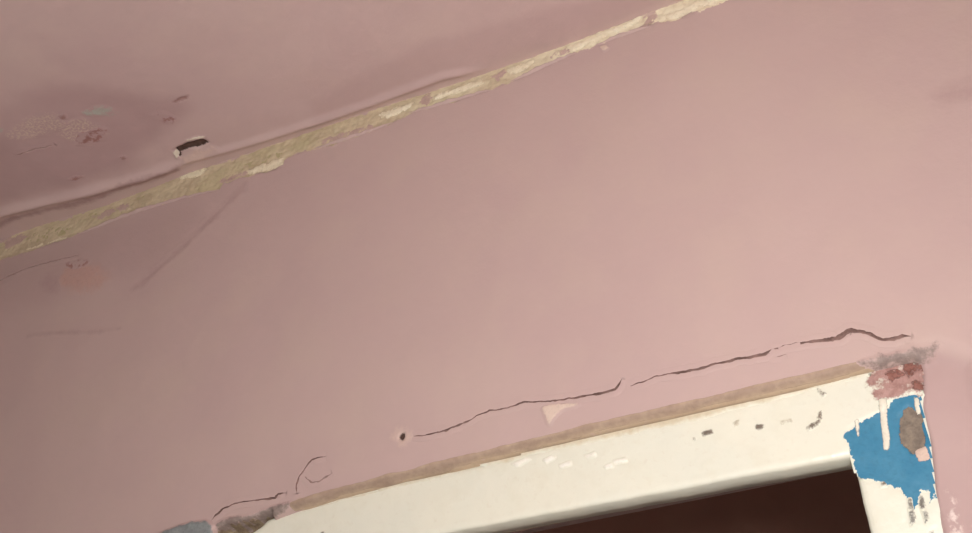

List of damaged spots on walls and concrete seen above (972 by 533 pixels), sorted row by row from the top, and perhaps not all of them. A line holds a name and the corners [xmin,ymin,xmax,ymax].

peeling [0,0,740,262]
crack [412,322,911,442]
spalling [215,500,294,533]
crack [209,451,333,523]
peeling [843,395,938,533]